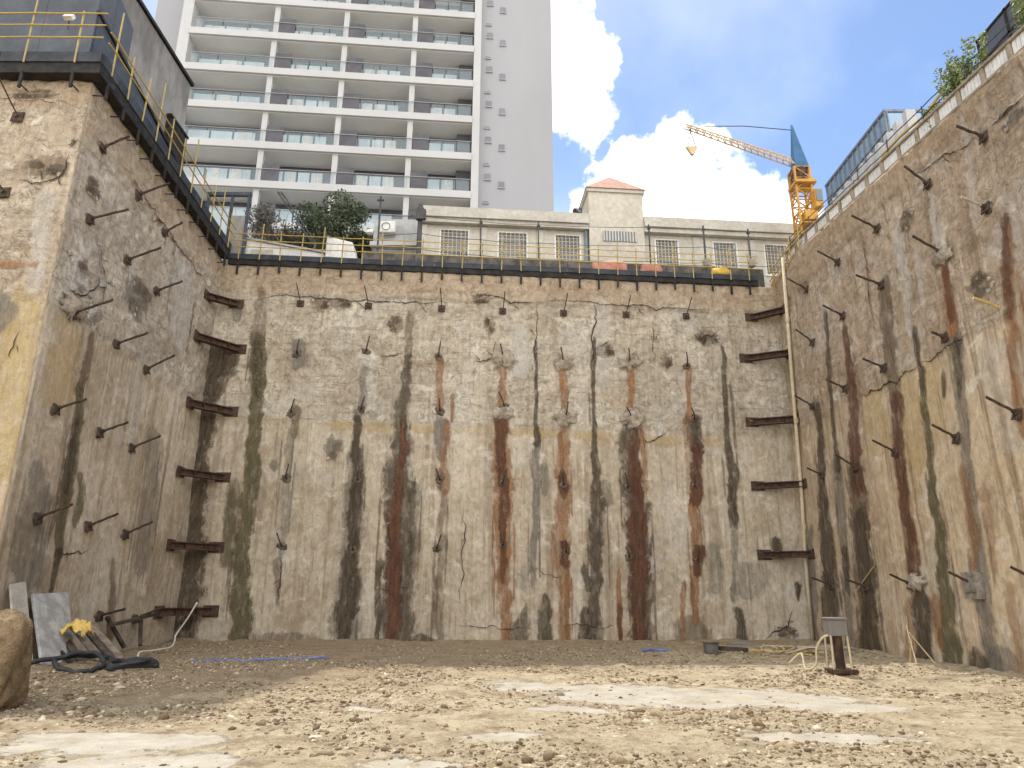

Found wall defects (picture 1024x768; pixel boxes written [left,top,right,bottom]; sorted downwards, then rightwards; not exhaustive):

leakage [173,332,278,641]
leakage [334,414,366,640]
crack [256,294,447,312]
corrosion [374,312,422,641]
corrosion [490,366,515,640]
corrosion [551,425,573,640]
leakage [578,337,610,640]
corrosion [617,425,658,641]
corrosion [680,367,706,641]
leakage [721,345,740,526]
leakage [734,607,749,640]
corrosion [841,324,883,651]